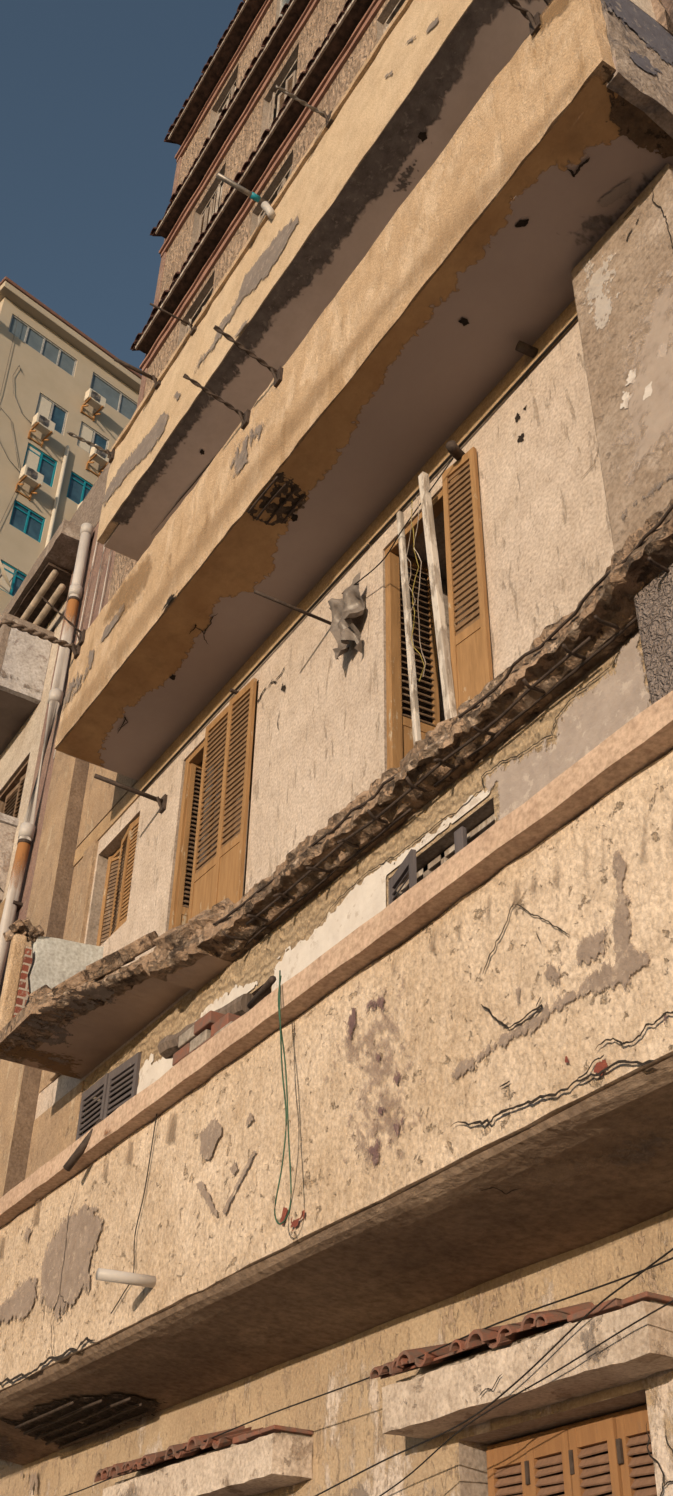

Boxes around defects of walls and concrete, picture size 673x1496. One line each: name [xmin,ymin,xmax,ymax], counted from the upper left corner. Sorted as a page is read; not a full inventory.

peeling [603,0,673,79]
spalling [602,65,673,159]
crack [624,188,673,254]
peeling [194,216,299,372]
peeling [102,391,181,506]
spalling [246,472,307,526]
peeling [196,633,651,1021]
crack [481,904,568,1031]
peeling [451,850,650,1079]
peeling [137,1053,173,1094]
crack [450,1011,673,1127]
spalling [0,1393,167,1449]